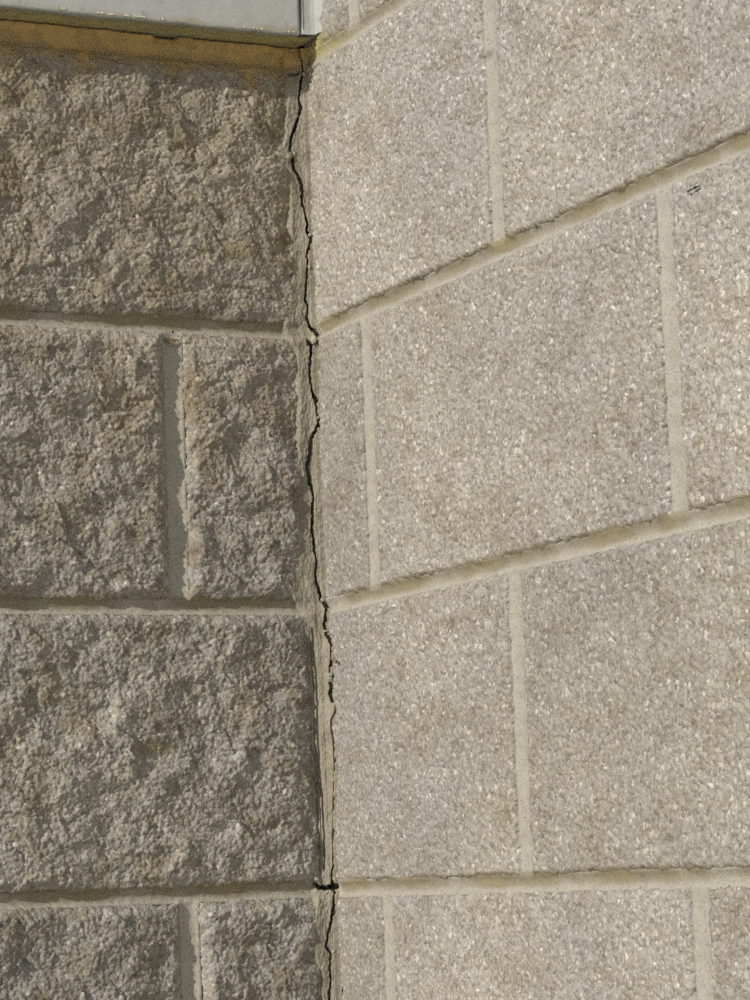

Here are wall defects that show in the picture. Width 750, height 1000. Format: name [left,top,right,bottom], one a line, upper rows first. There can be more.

crack [284,0,337,1000]